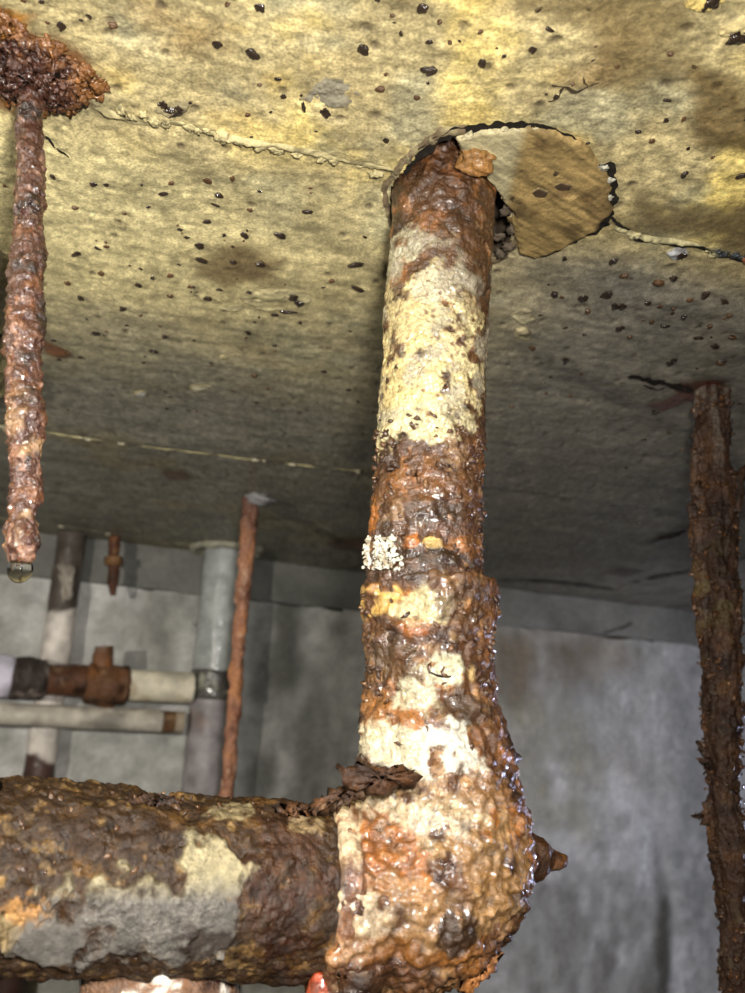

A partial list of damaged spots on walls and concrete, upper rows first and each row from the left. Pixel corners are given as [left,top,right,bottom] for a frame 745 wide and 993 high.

crack [45,136,69,157]
spalling [491,191,517,264]
rust [44,342,71,358]
rust [330,539,366,550]
rust [695,740,712,771]
rust [124,792,182,807]
rust [271,761,424,819]
rust [690,796,713,826]
rust [457,952,504,993]